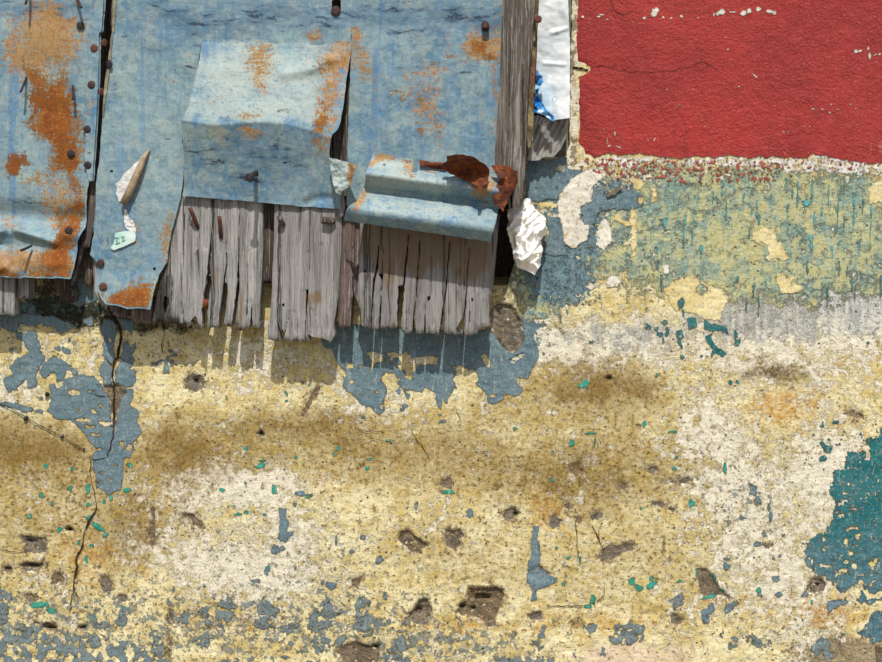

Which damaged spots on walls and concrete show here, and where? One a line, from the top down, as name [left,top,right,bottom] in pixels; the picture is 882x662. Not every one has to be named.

rust [242,41,273,80]
rust [0,29,86,277]
rust [309,100,333,152]
rust [403,159,445,178]
rust [102,276,156,307]
peeling [645,264,743,359]
peeling [0,312,142,537]
crack [69,306,126,613]
flaking render [812,409,864,470]
flaking render [0,536,48,625]
flaking render [217,580,413,662]
flaking render [456,587,504,627]